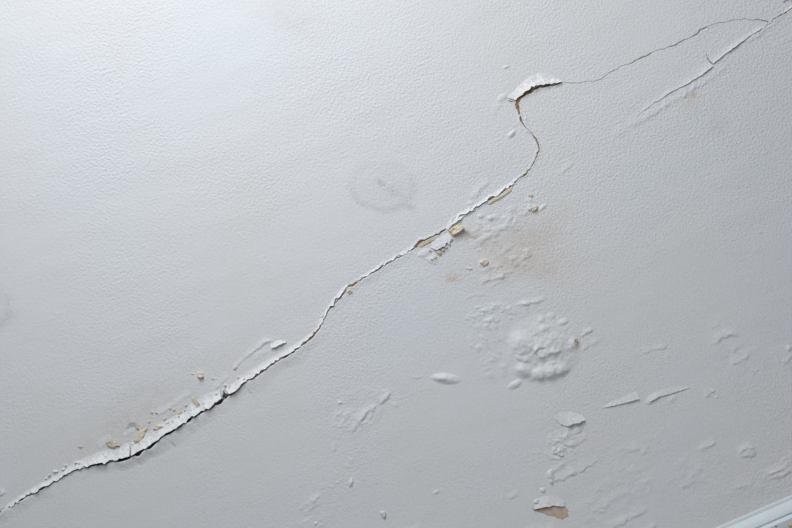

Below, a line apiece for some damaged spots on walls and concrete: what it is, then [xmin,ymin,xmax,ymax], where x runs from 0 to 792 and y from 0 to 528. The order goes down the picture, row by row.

peeling [489,73,562,130]
crack [561,4,792,142]
crack [0,98,542,525]
flaking render [95,389,200,449]
peeling [530,412,601,520]